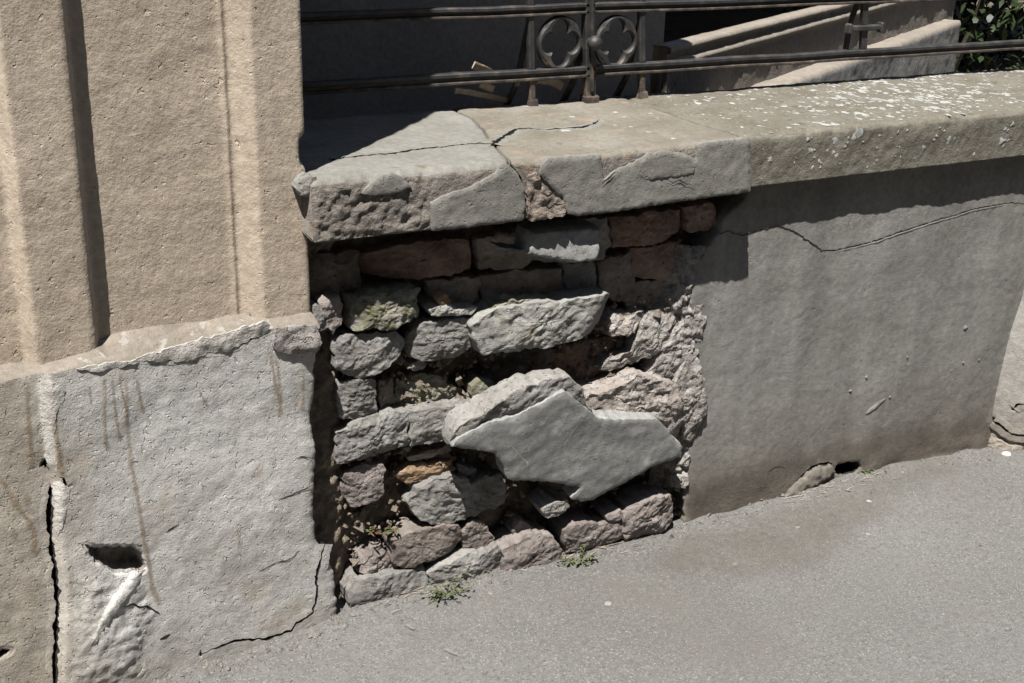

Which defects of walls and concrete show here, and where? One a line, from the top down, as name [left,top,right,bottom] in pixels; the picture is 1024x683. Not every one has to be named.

crack [328,119,605,161]
crack [719,202,1024,253]
flaking render [657,244,710,323]
flaking render [440,368,694,502]
spalling [784,456,864,497]
crack [38,462,74,683]
spalling [83,542,150,578]
crack [201,541,333,660]